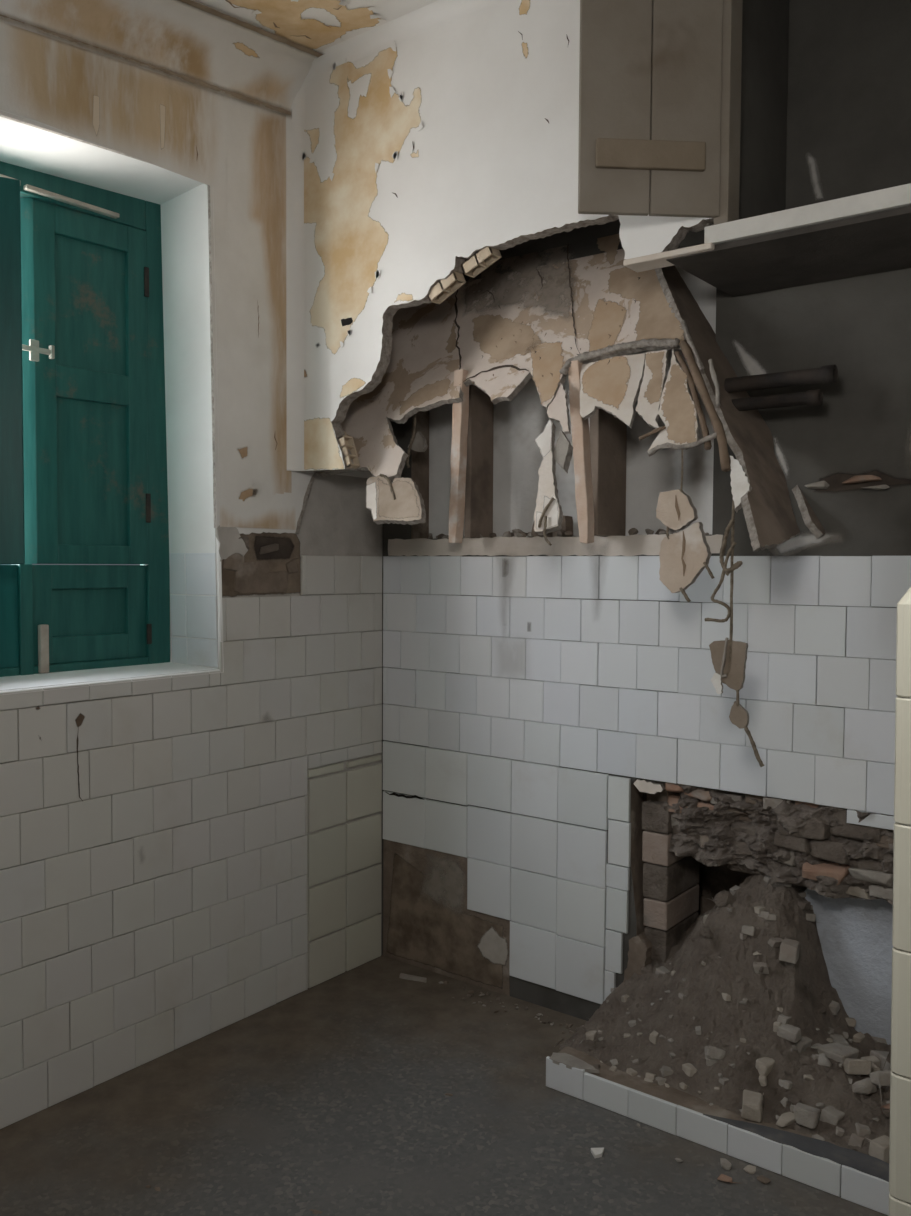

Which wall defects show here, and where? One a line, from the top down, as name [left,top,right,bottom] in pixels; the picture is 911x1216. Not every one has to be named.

peeling [228,0,385,51]
peeling [302,40,423,354]
water stain [0,0,312,530]
spalling [428,247,502,304]
spalling [542,300,680,377]
peeling [340,378,365,398]
spalling [408,431,428,452]
spalling [215,418,360,597]
corrosion [75,713,85,801]
peeling [383,839,510,996]